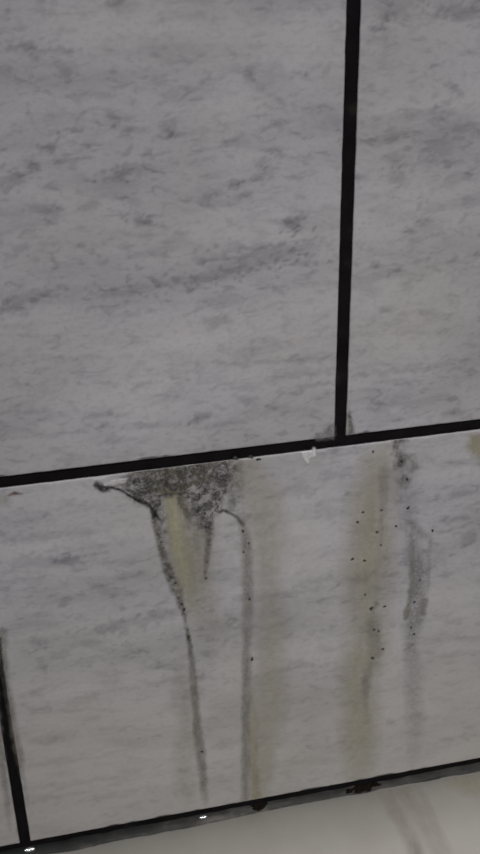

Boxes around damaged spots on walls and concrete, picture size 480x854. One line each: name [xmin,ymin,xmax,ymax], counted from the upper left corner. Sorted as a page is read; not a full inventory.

water stain [94,455,261,615]
water stain [186,630,206,784]
water stain [243,628,268,811]